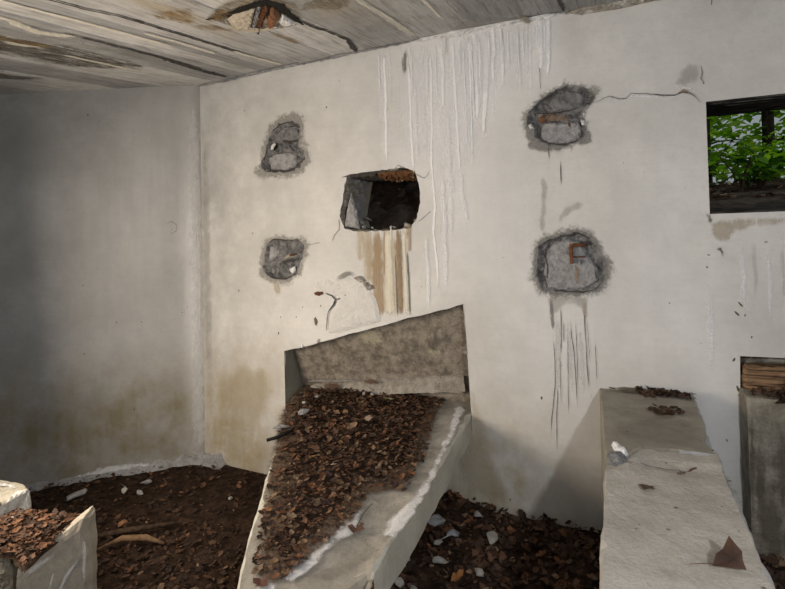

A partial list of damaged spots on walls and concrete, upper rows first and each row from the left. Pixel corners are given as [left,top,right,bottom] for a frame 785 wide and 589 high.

leakage [0,17,142,71]
leakage [0,0,214,54]
flaking render [255,112,309,178]
leakage [304,0,565,302]
flaking render [522,83,599,156]
crack [594,67,704,103]
flaking render [260,236,318,293]
spalling [332,165,431,241]
rust [358,227,411,314]
flaking render [532,228,612,298]
leakage [709,217,750,253]
leakage [550,303,597,435]